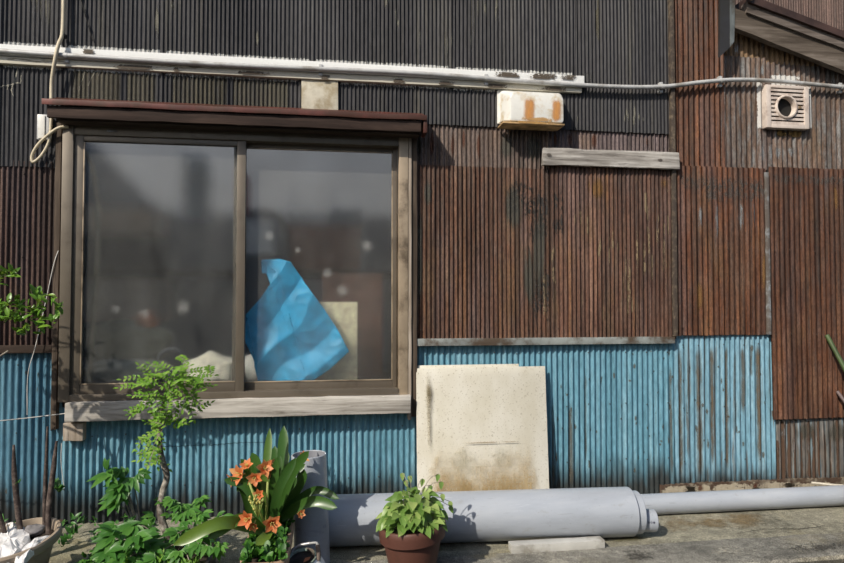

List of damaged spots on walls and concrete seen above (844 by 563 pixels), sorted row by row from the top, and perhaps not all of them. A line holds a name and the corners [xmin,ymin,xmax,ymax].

corrosion [518,100,560,124]
damp [527,137,540,160]
damp [506,179,564,320]
spalling [661,481,829,493]